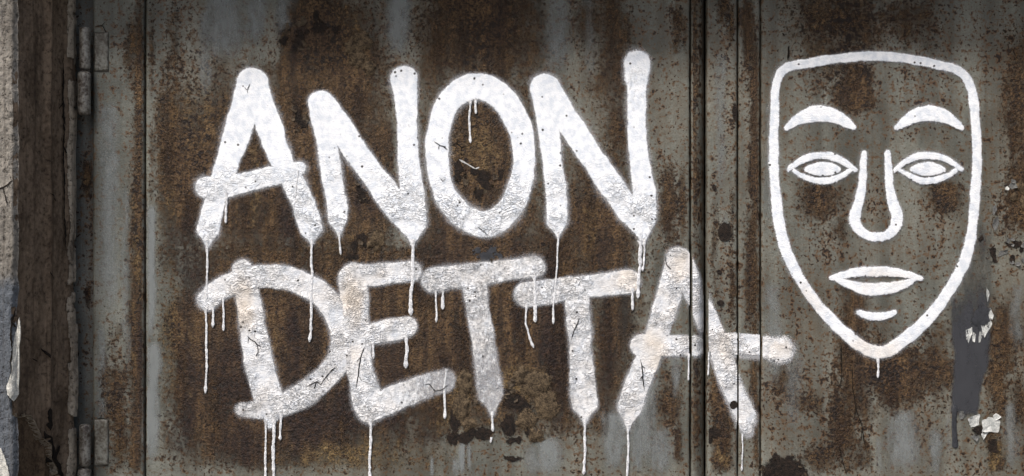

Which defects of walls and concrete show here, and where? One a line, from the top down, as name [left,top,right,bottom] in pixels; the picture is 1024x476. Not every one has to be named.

peeling [67,0,77,65]
rust [778,0,942,116]
rust [99,0,688,474]
rust [793,176,850,245]
peeling [0,80,79,476]
peeling [966,289,994,343]
rust [771,277,954,474]
water stain [454,444,470,471]
water stain [528,439,558,471]
water stain [605,414,624,463]
water stain [634,389,667,467]
peeling [959,411,1001,453]